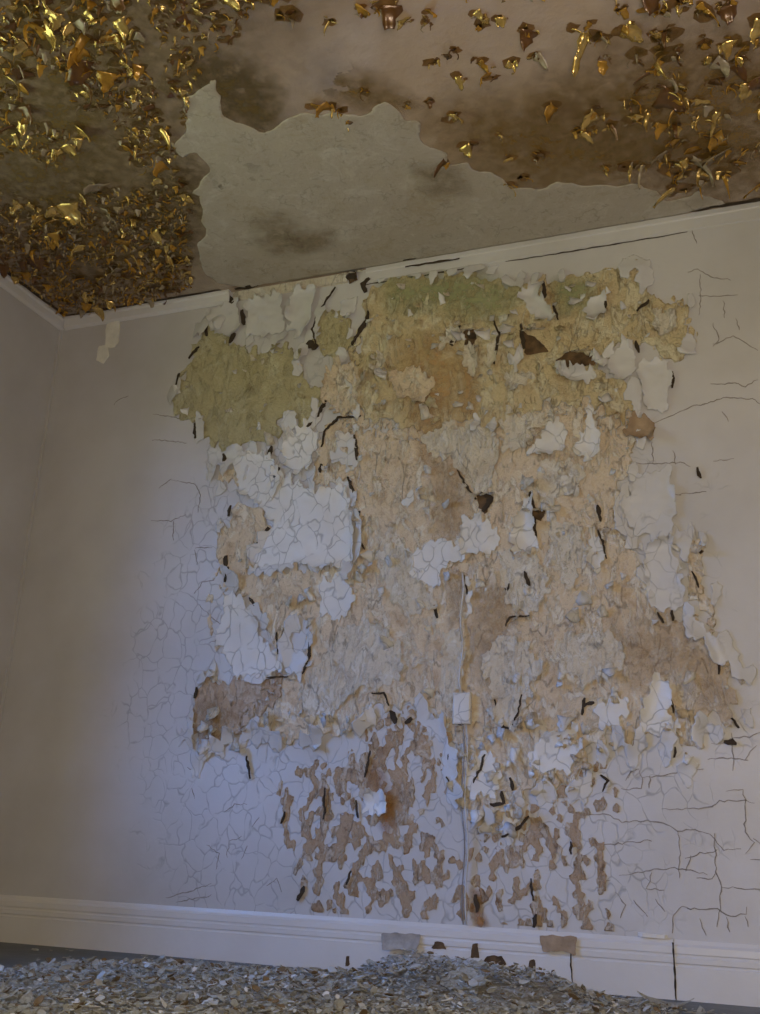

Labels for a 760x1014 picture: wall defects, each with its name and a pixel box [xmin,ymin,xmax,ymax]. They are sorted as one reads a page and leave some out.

damp [329,73,399,107]
damp [468,45,760,187]
flaking render [0,0,760,322]
crack [688,269,758,351]
crack [630,380,760,467]
flaking render [167,254,757,931]
crack [586,732,760,1000]
peeling [381,932,421,954]
spalling [471,943,536,977]